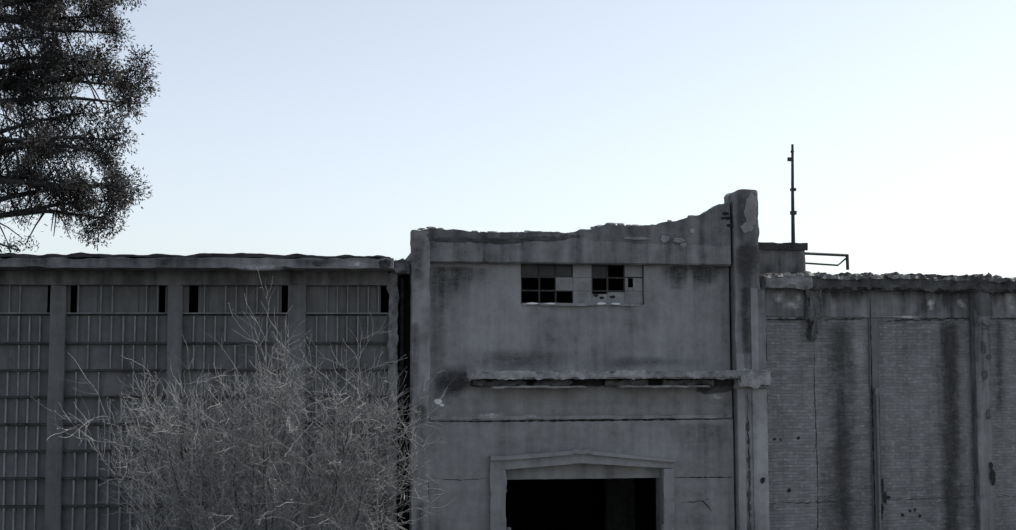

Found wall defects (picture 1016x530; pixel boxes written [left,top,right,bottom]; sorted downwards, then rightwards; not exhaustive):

peeling [721,193,757,233]
leakage [942,326,958,530]